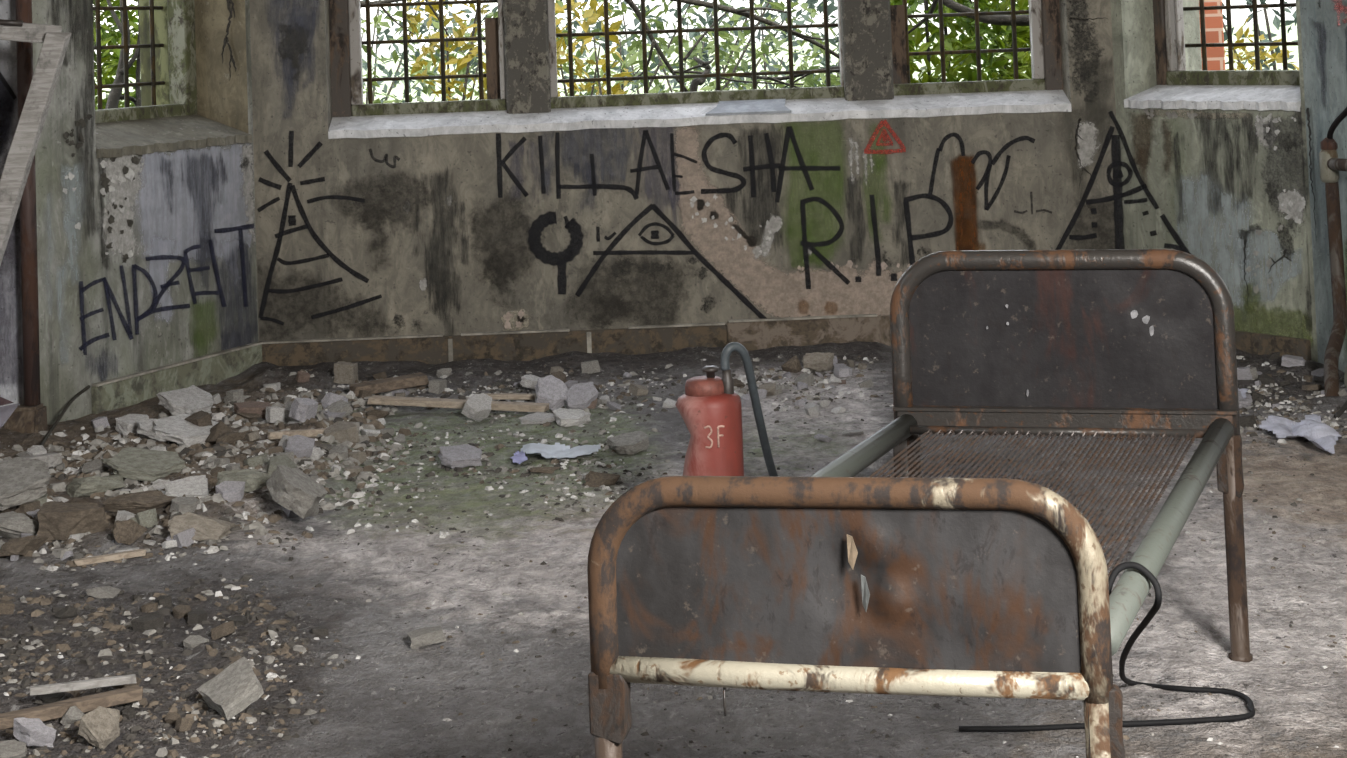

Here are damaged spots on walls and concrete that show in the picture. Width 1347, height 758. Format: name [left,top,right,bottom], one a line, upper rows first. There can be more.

damp [269,0,318,116]
peeling [58,114,92,317]
peeling [98,155,145,268]
damp [726,128,781,242]
peeling [674,126,928,318]
damp [846,126,910,266]